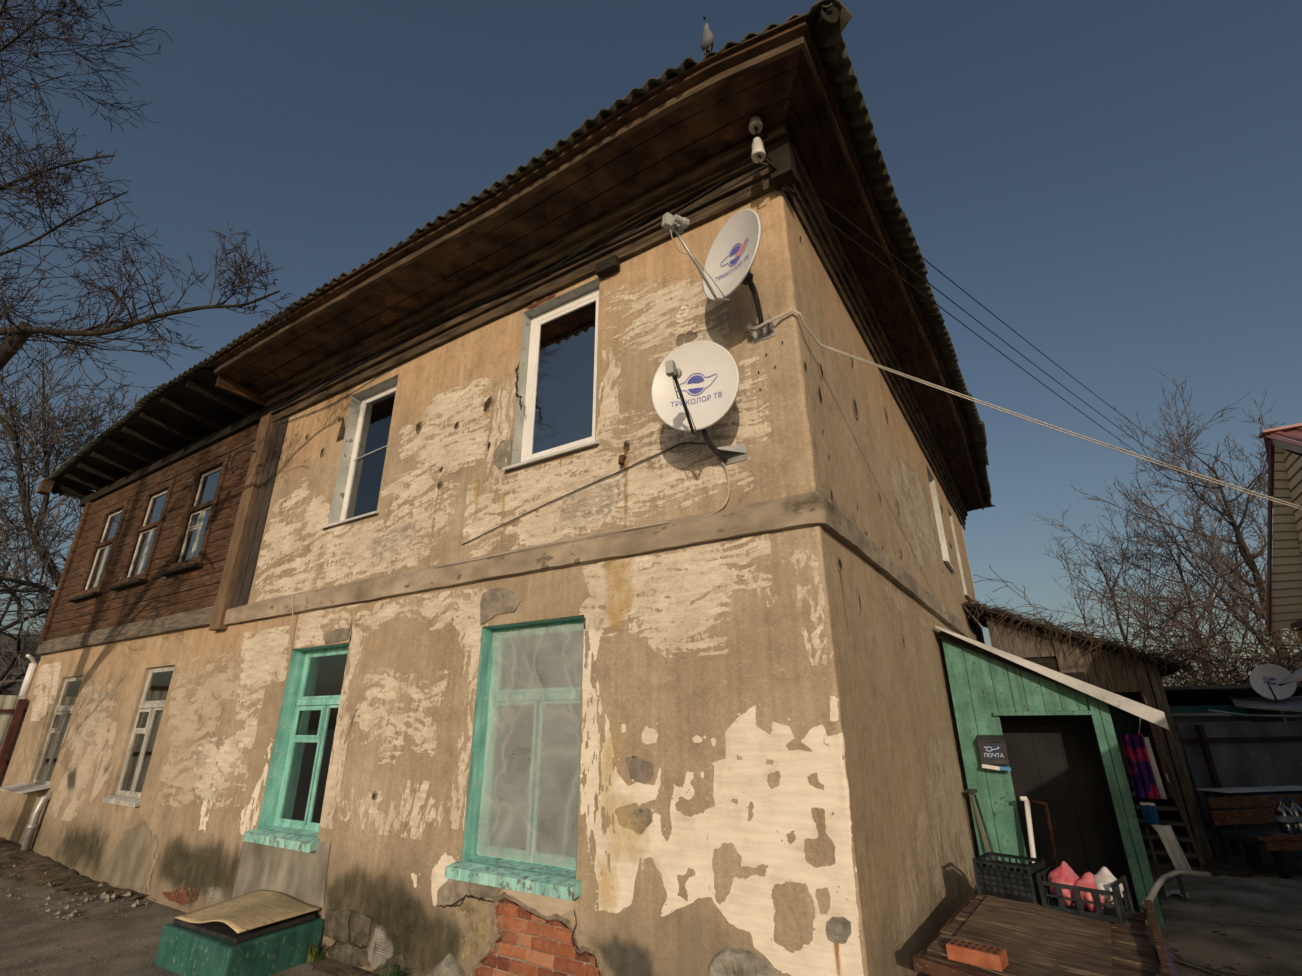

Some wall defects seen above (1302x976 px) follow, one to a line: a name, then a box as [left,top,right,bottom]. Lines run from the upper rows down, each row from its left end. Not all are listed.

flaking render [255,275,776,602]
flaking render [30,662,62,721]
flaking render [50,684,117,821]
flaking render [158,587,520,840]
flaking render [579,531,864,976]
flaking render [411,853,603,976]